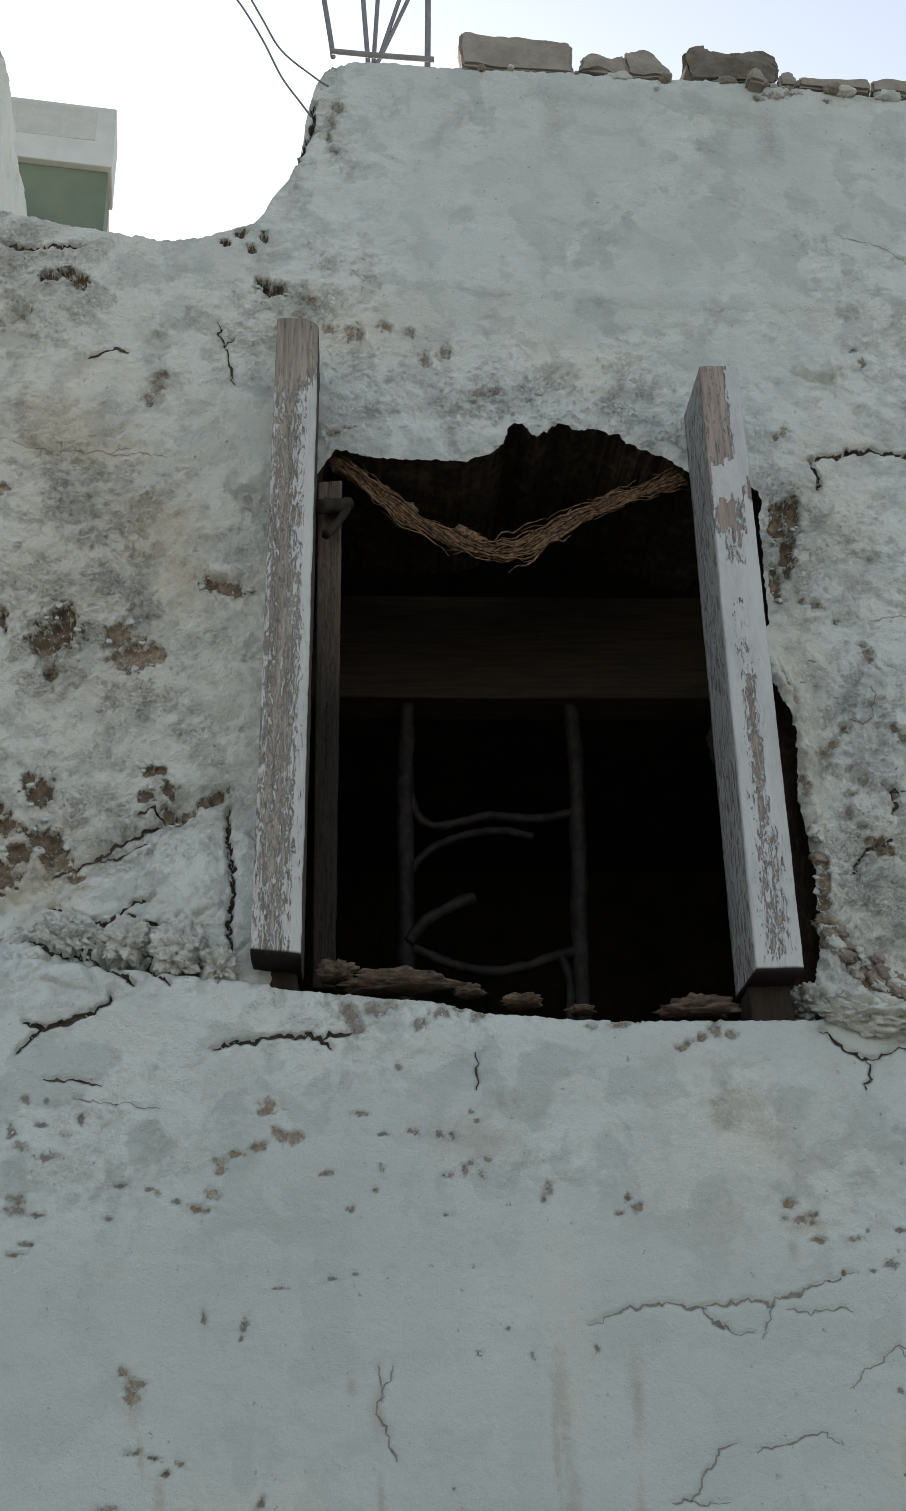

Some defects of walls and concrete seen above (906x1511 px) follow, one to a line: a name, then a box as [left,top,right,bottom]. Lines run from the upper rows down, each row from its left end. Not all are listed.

crack [810,448,906,491]
flaking render [766,495,822,608]
flaking render [0,601,89,682]
flaking render [103,618,166,675]
flaking render [0,772,86,897]
flaking render [136,762,232,827]
crack [224,810,237,952]
crack [16,805,186,1054]
flaking render [812,861,902,997]
crack [215,1031,352,1050]
crack [820,1032,906,1090]
crack [588,1272,854,1338]